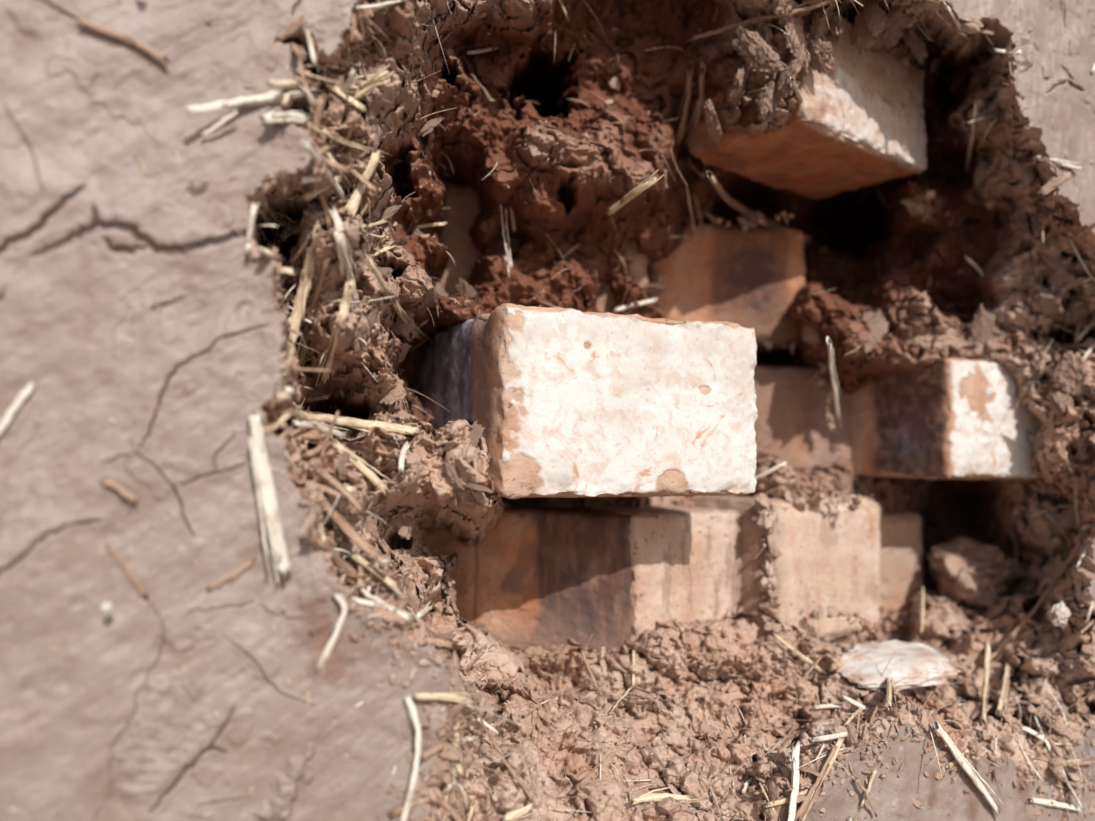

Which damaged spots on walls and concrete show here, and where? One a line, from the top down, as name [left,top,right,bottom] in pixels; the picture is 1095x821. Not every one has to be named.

crack [41,0,75,20]
crack [1046,66,1084,93]
crack [0,101,247,256]
crack [99,324,269,537]
spalling [243,0,1095,821]
crack [0,520,102,571]
crack [190,601,327,620]
crack [94,598,164,821]
crack [150,707,246,821]
crack [223,635,314,707]